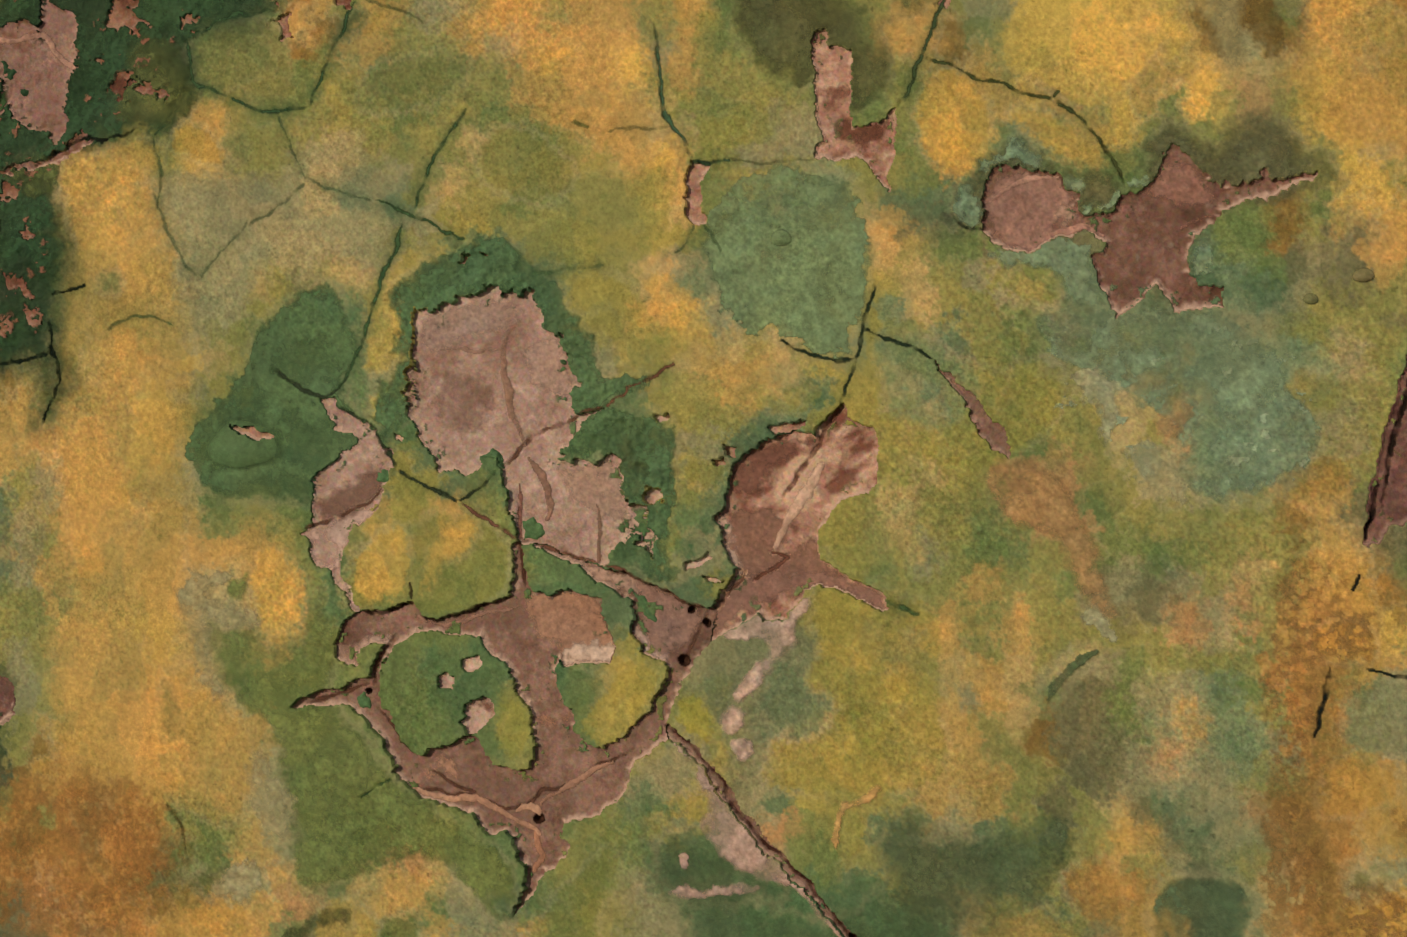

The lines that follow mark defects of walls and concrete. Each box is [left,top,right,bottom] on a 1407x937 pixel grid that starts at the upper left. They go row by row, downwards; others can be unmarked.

peeling [0,0,94,202]
peeling [106,0,152,35]
crack [574,46,730,166]
peeling [811,29,898,192]
crack [903,0,1123,178]
peeling [981,144,1318,319]
crack [277,114,790,656]
crack [780,288,931,491]
peeling [1363,355,1407,548]
peeling [292,285,889,937]
crack [310,648,563,810]
crack [674,729,847,930]